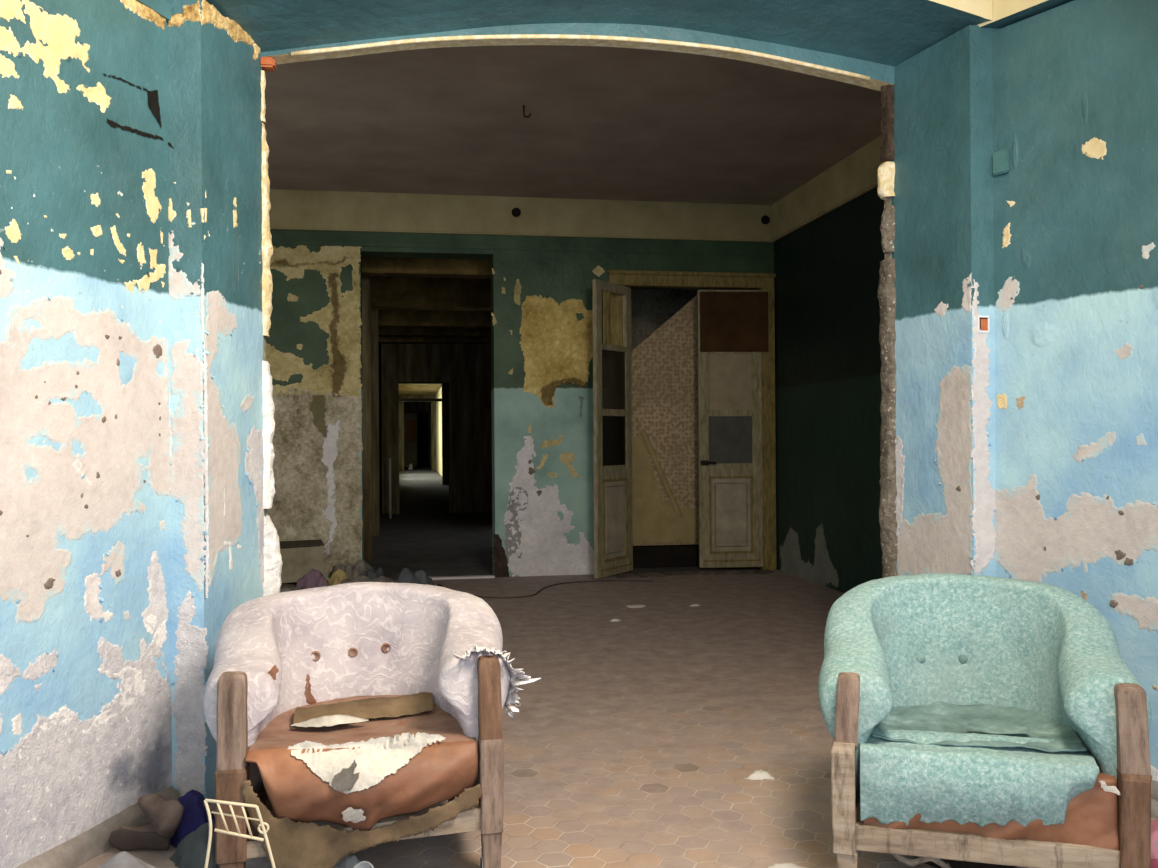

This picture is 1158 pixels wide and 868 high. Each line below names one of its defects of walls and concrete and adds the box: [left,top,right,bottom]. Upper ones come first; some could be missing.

peeling [492,268,593,417]
peeling [877,84,1158,583]
peeling [0,0,363,868]
peeling [493,424,594,577]
peeling [1110,593,1158,633]